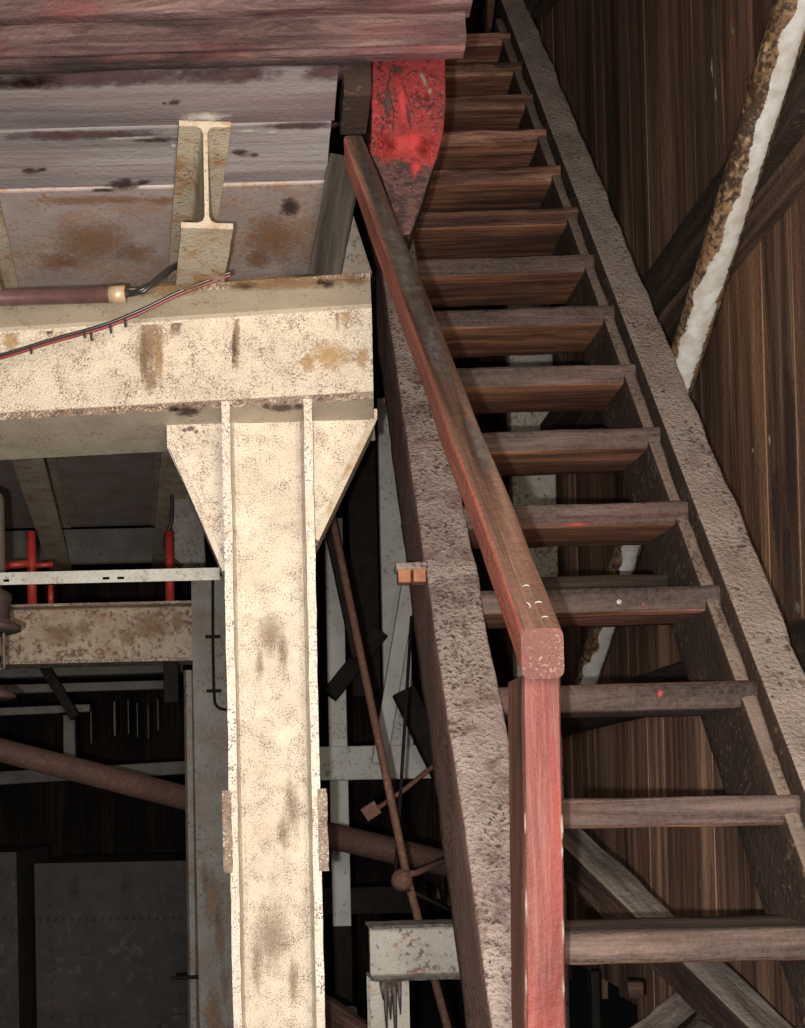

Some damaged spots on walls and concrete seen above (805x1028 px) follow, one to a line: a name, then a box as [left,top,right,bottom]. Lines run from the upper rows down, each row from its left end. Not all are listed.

leakage [0,77,61,89]
leakage [177,67,262,83]
leakage [12,131,178,142]
leakage [94,178,149,192]
rust [140,323,181,388]
rust [302,344,367,369]